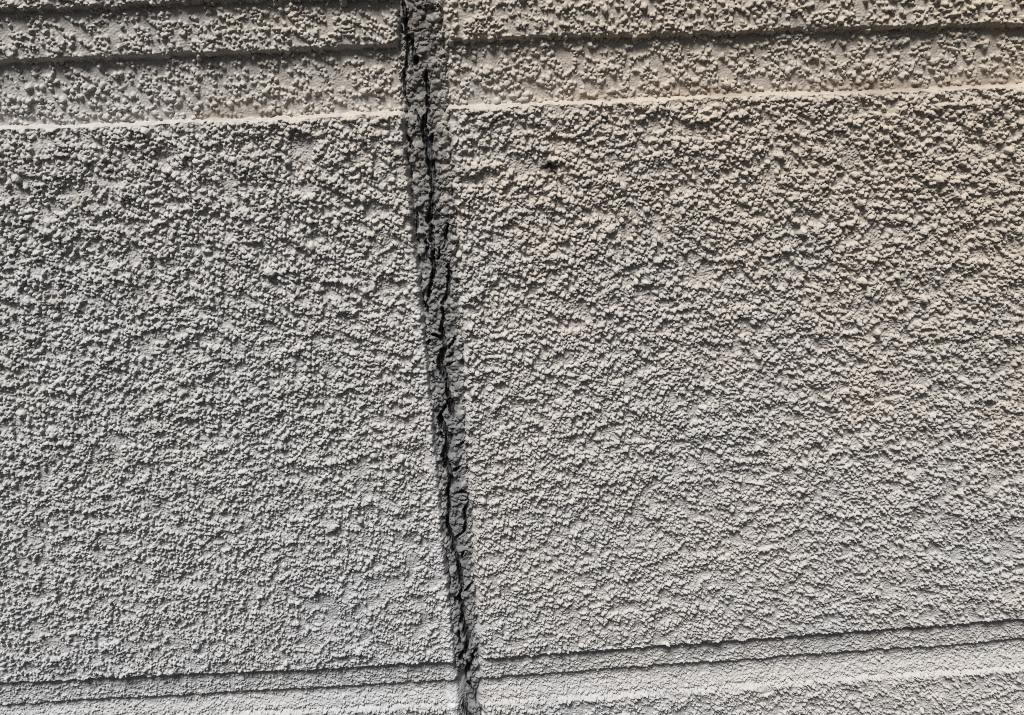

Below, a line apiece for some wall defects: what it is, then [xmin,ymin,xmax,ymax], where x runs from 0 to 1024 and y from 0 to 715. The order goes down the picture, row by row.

crack [399,0,477,715]